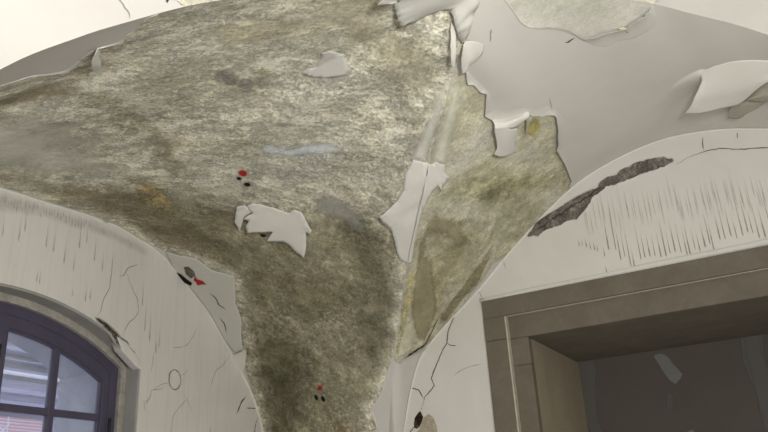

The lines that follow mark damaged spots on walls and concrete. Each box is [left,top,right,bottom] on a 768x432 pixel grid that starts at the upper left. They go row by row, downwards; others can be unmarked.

flaking render [505,0,659,47]
damp [0,86,78,105]
flaking render [0,0,484,432]
flaking render [394,65,674,366]
damp [45,183,392,432]
damp [397,218,490,348]
crack [410,318,455,432]